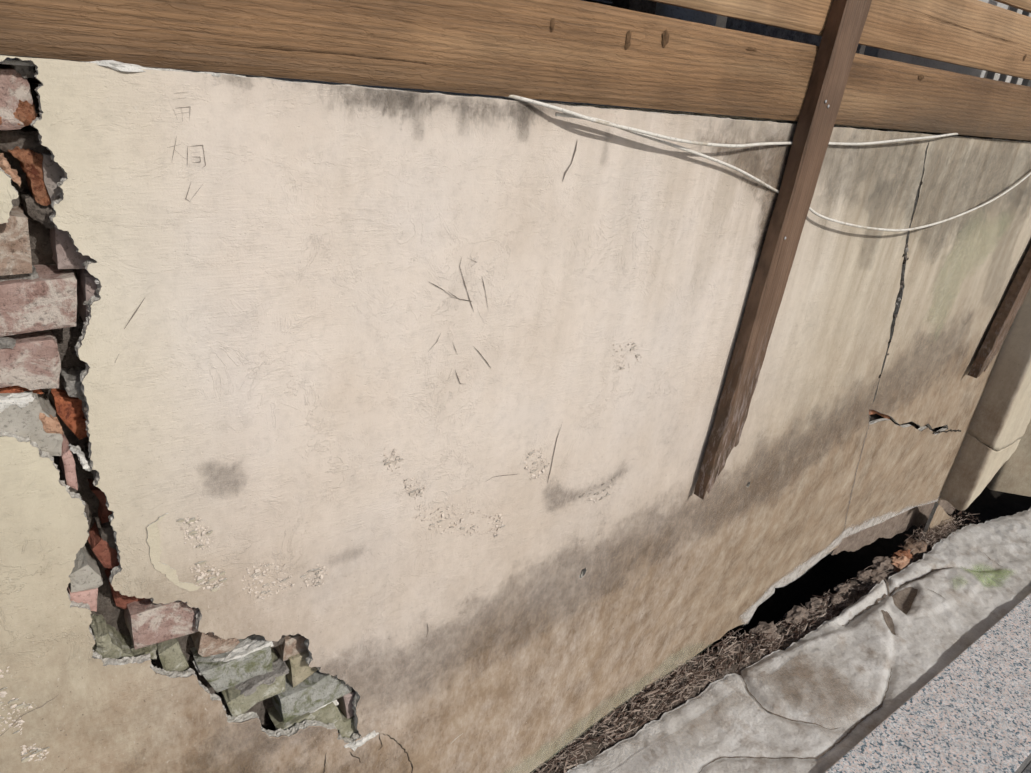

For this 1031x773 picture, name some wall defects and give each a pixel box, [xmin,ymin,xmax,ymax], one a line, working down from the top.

crack [878,180,923,378]
crack [0,57,413,773]
peeling [146,513,227,592]
spalling [697,522,927,656]
damp [744,507,912,622]
spalling [943,486,1031,530]
peeling [0,666,50,762]
crack [699,668,892,773]